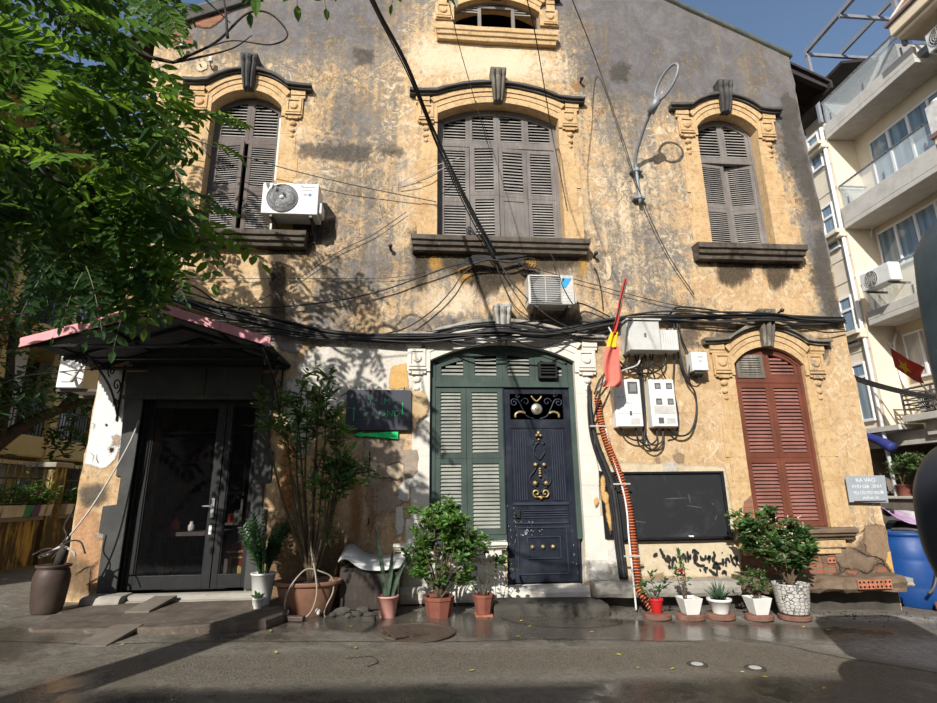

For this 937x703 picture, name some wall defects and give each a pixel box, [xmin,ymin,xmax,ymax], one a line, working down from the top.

leakage [415,254,581,297]
peeling [85,370,126,468]
peeling [283,341,429,536]
peeling [585,452,895,582]